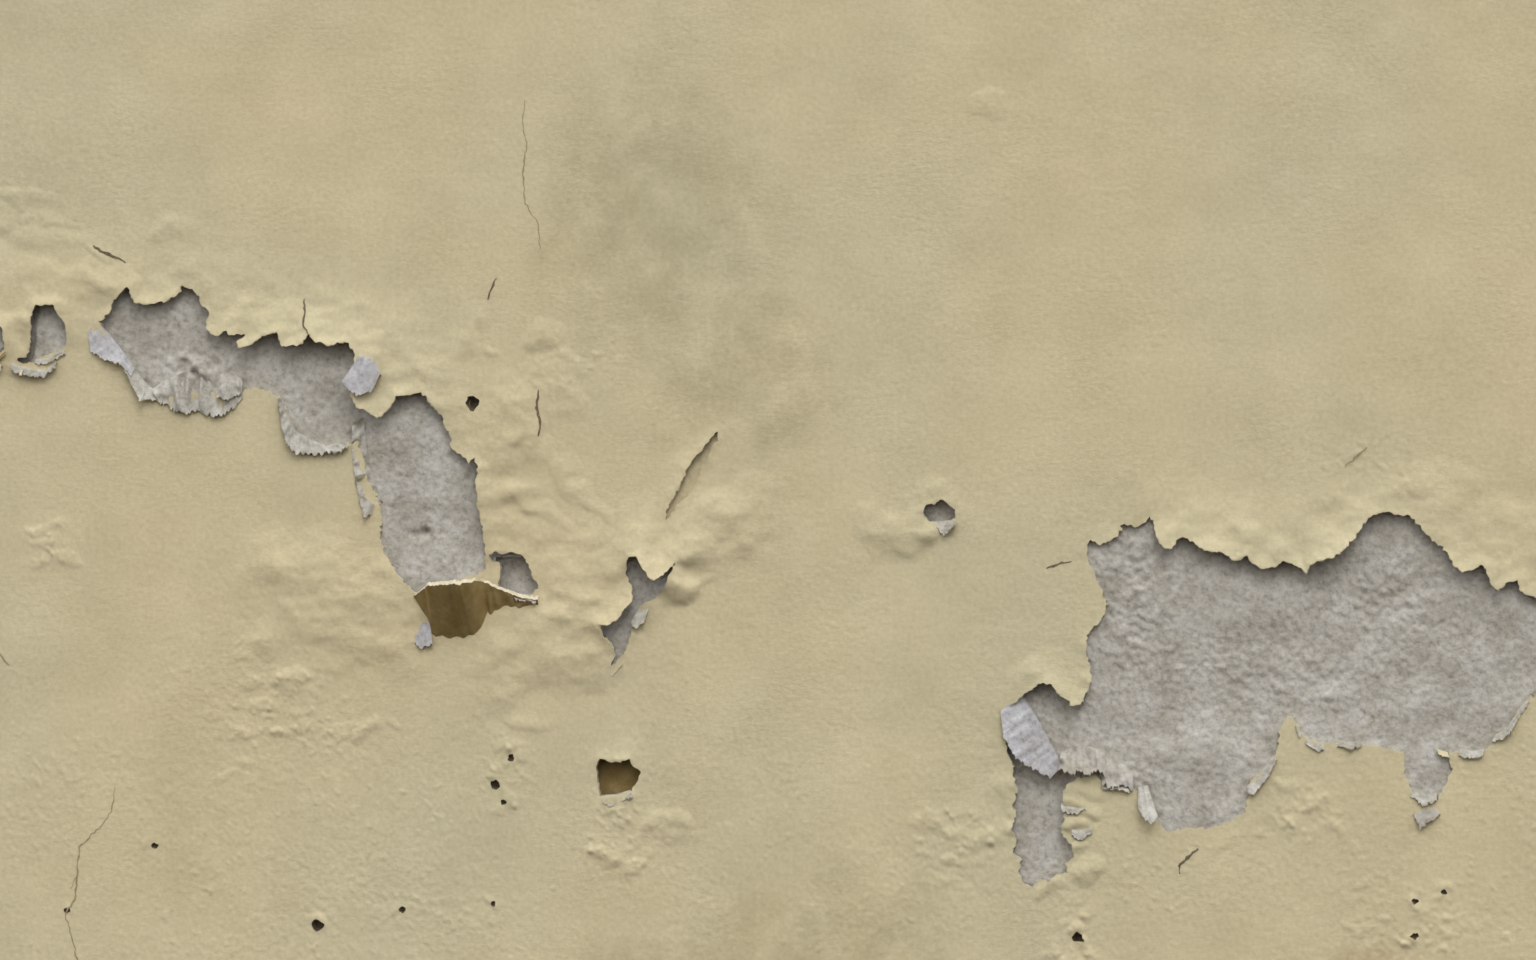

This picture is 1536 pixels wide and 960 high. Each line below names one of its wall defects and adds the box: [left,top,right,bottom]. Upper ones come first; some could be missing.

peeling [0,208,754,696]
spalling [560,734,706,883]
peeling [844,473,976,563]
peeling [971,435,1536,886]